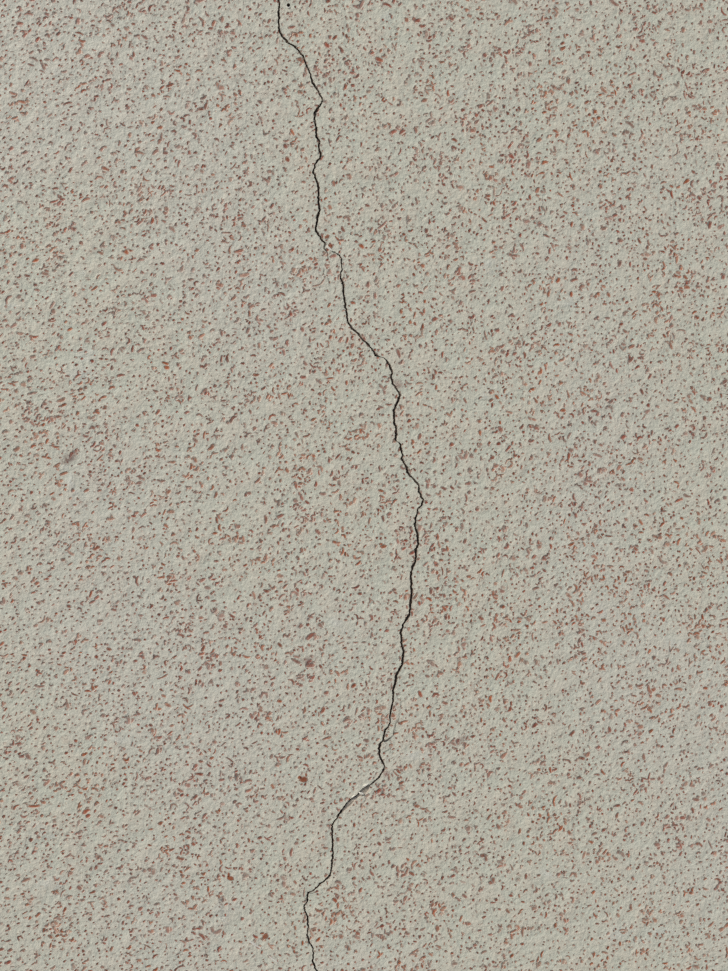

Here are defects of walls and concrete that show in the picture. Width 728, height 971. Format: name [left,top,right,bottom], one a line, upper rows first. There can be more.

crack [277,0,424,971]